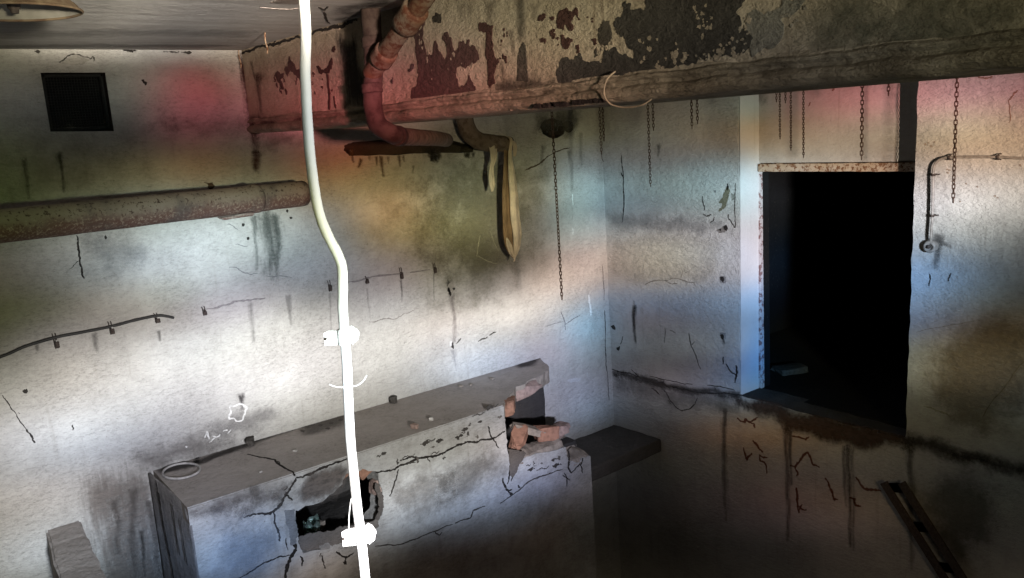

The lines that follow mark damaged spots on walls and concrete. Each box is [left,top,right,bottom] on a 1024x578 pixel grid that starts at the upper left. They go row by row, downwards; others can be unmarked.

peeling [407,0,528,99]
peeling [538,0,808,83]
crack [70,235,85,279]
corrosion [217,212,254,220]
damp [263,215,279,265]
crack [2,395,36,443]
spalling [508,422,569,477]
crack [548,310,881,513]
spalling [284,483,384,551]
crack [239,426,583,578]